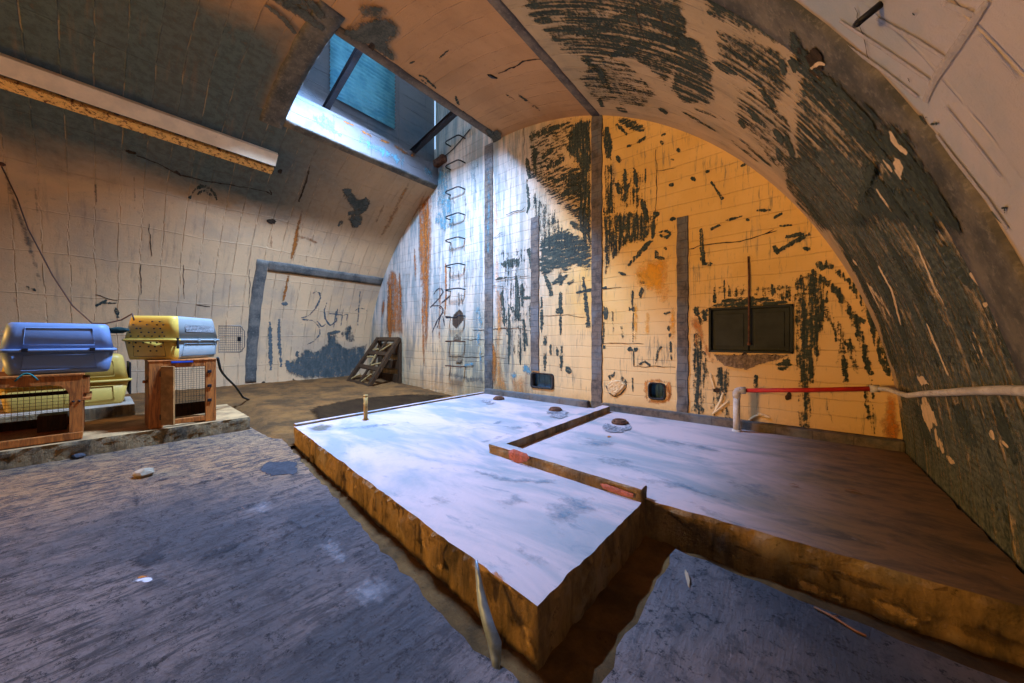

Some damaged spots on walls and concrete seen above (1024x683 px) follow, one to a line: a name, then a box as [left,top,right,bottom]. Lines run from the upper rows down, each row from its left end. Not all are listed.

corrosion [291,216,317,259]
corrosion [382,272,402,337]
corrosion [414,196,447,354]
peeling [496,0,1024,574]
leakage [268,319,366,379]
leakage [260,461,298,476]